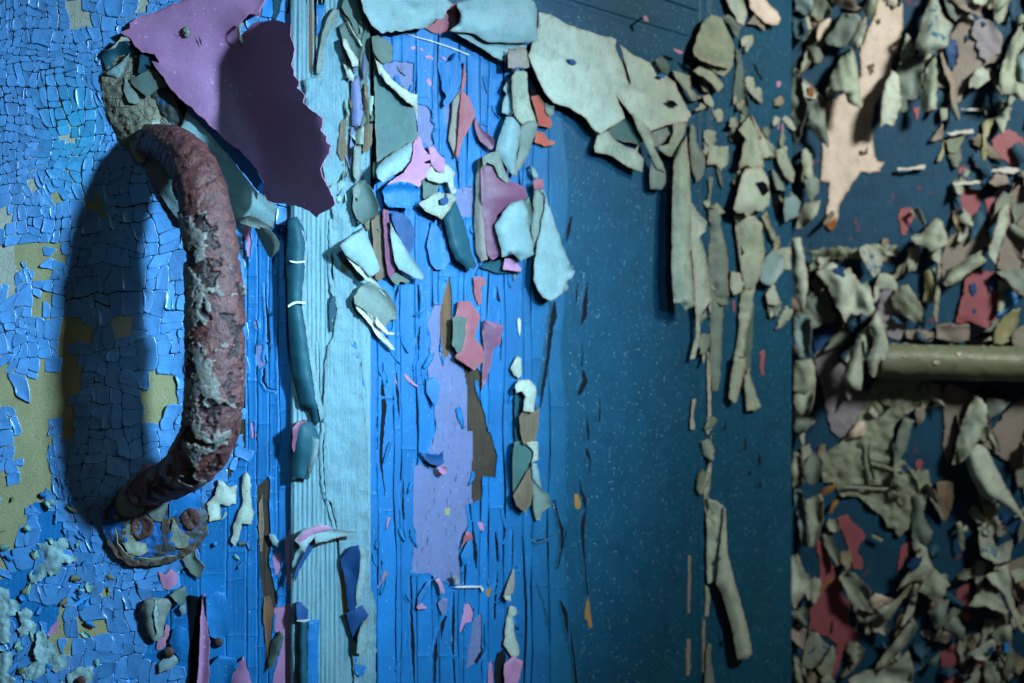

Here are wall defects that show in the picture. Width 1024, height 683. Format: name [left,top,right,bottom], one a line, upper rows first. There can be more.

peeling [424,3,461,34]
peeling [384,46,513,233]
peeling [695,76,796,159]
peeling [779,0,903,231]
peeling [913,0,1024,356]
peeling [0,124,185,683]
corrosion [107,501,208,566]
crack [0,0,320,683]
peeling [378,260,498,586]
crack [351,23,601,683]
peeling [813,290,937,440]
peeling [792,483,1024,683]